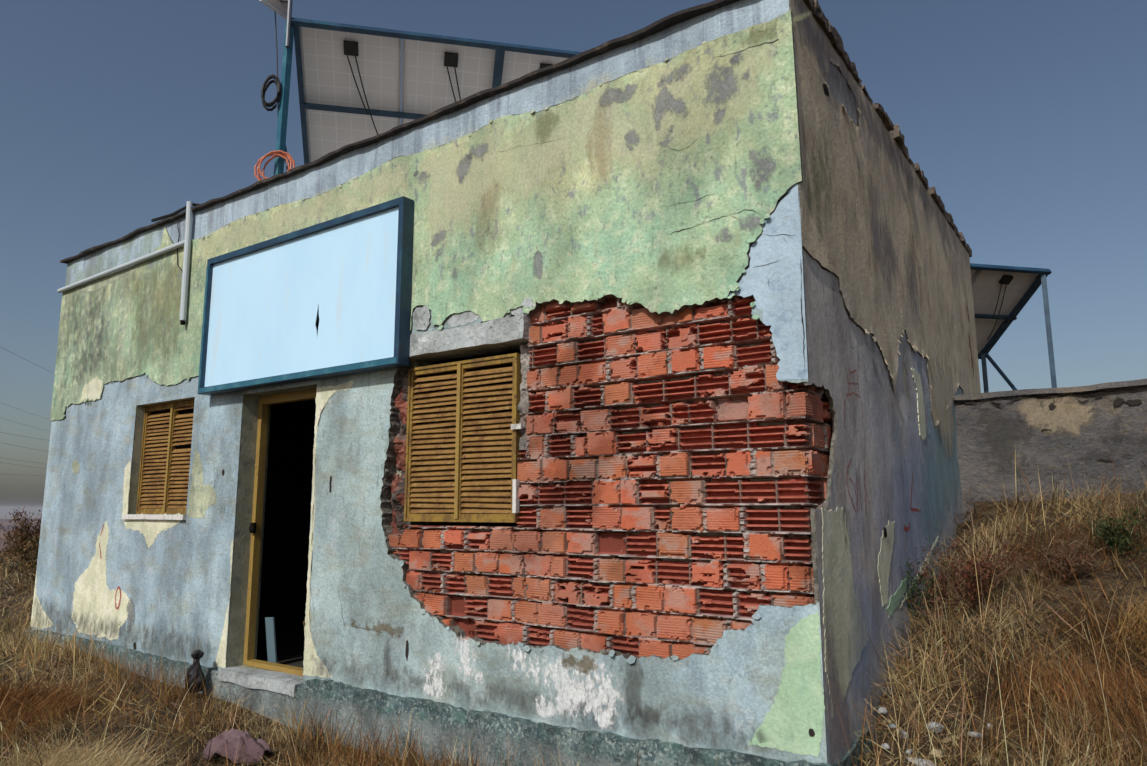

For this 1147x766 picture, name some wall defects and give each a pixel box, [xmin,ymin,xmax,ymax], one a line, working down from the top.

leakage [202,52,760,260]
leakage [749,150,776,189]
leakage [533,251,543,279]
spalling [30,183,963,765]
leakage [418,653,447,698]
leakage [455,637,483,684]
leakage [502,645,658,728]